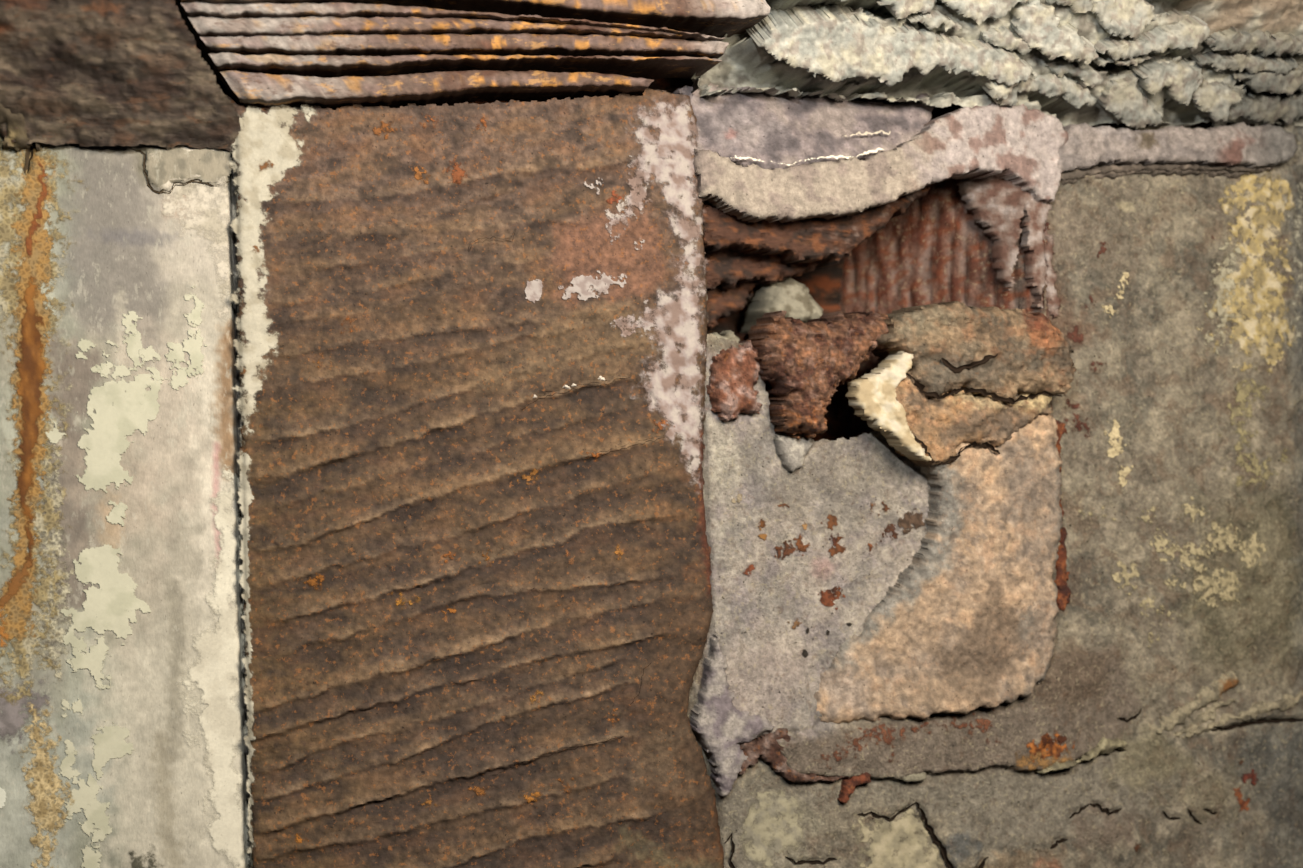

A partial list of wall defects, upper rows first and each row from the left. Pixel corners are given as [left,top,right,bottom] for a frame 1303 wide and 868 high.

leakage [605,96,708,494]
rust [702,184,932,329]
rust [0,134,82,703]
peeling [45,284,207,526]
peeling [845,351,932,461]
peeling [61,541,151,689]
rust [758,514,846,560]
rust [818,587,846,610]
peeling [58,721,134,868]
crack [785,856,837,864]
crack [858,802,989,868]
crack [1212,718,1303,731]